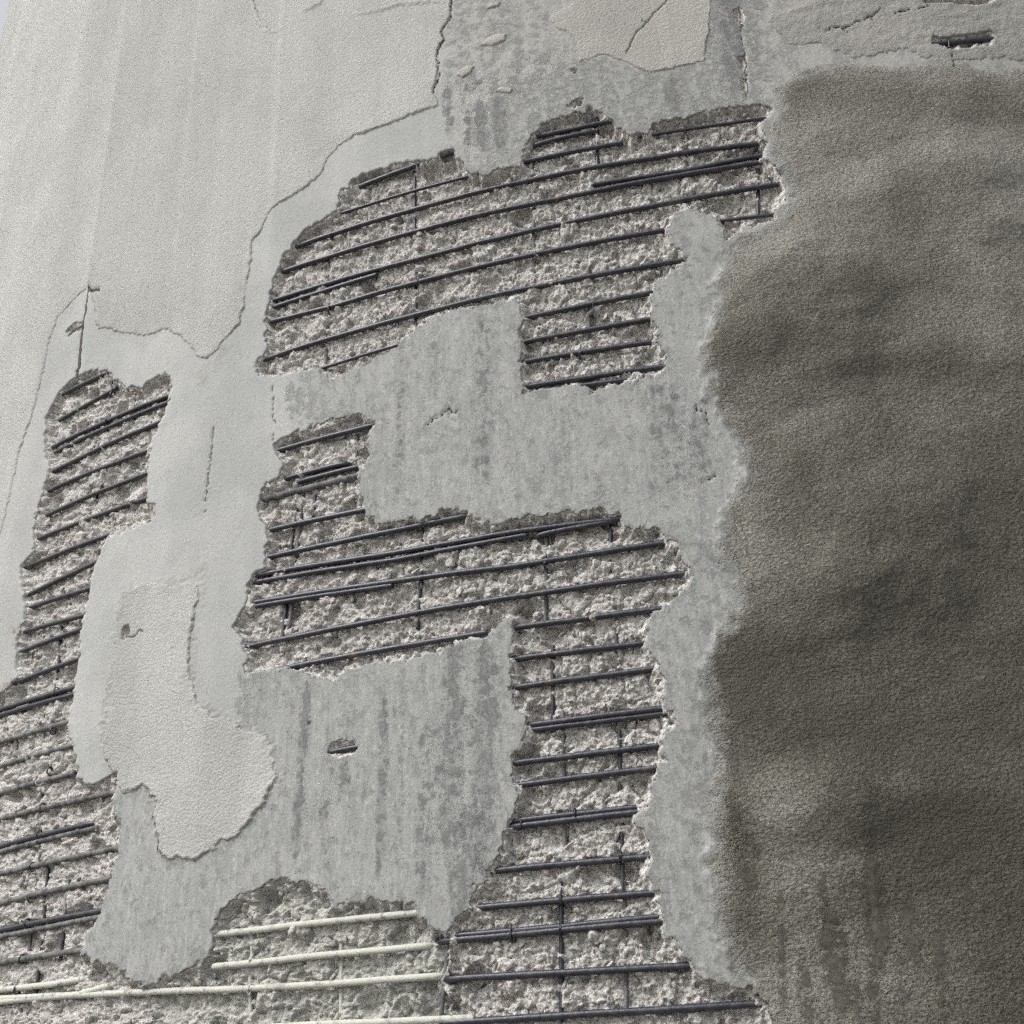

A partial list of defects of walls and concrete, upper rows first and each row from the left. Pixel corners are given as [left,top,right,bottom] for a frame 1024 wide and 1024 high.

crack [433,1,452,93]
flaking render [765,0,1024,63]
crack [68,284,100,381]
spalling [0,0,786,1024]
leakage [693,60,1024,1024]